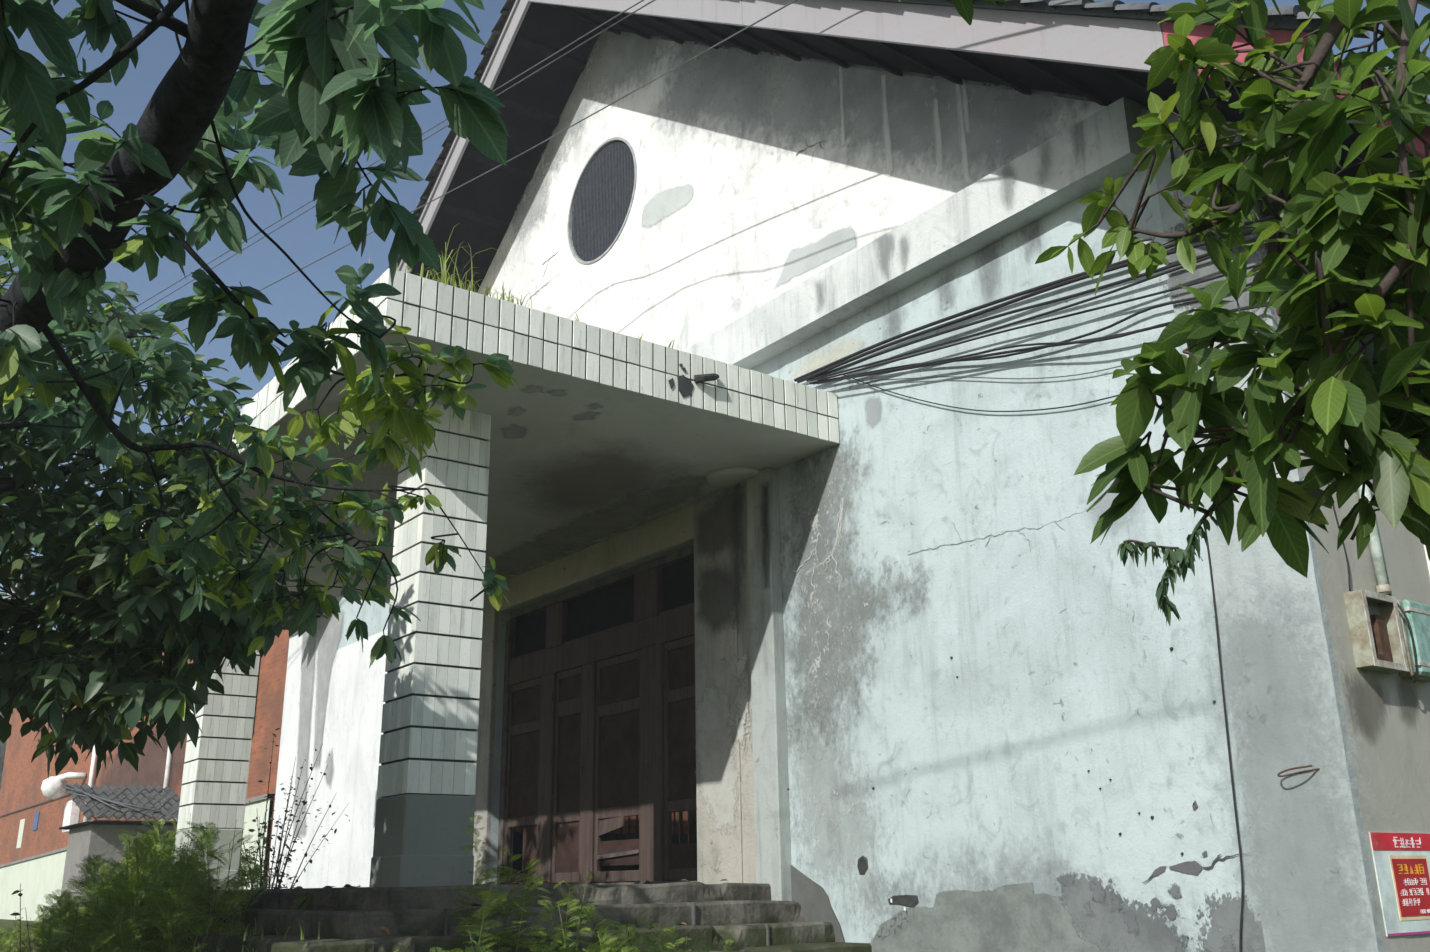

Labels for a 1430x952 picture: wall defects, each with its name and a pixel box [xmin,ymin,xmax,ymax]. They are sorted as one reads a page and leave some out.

damp [882,76,893,174]
damp [956,79,969,181]
spalling [669,364,719,398]
damp [698,484,741,631]
damp [785,451,923,735]
crack [908,506,1098,555]
flaking render [870,851,1266,952]
crack [1203,854,1243,869]